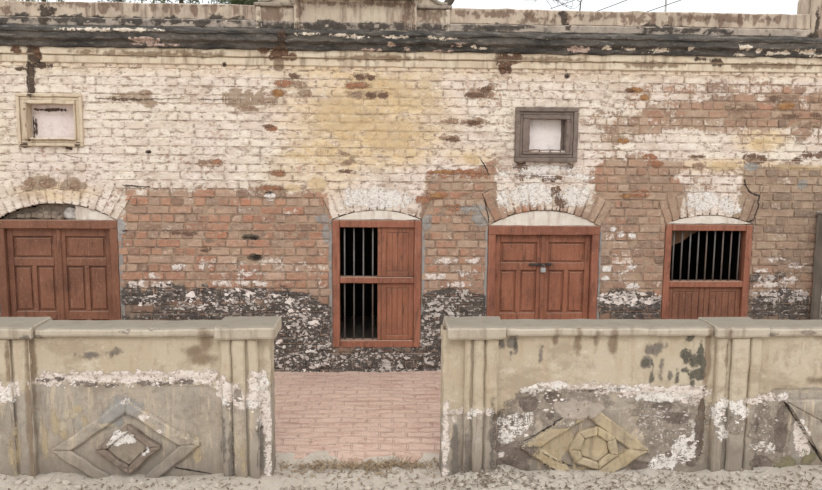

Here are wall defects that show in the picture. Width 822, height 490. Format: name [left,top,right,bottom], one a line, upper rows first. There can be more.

water stain [10,44,53,98]
water stain [37,3,57,24]
peeling [52,27,225,65]
water stain [558,11,571,31]
flaking render [731,44,822,69]
water stain [20,108,66,148]
peeling [426,160,595,213]
crack [744,179,764,222]
water stain [537,326,713,405]
flaking render [214,369,272,438]
flaking render [448,381,614,472]
flaking render [619,389,811,470]